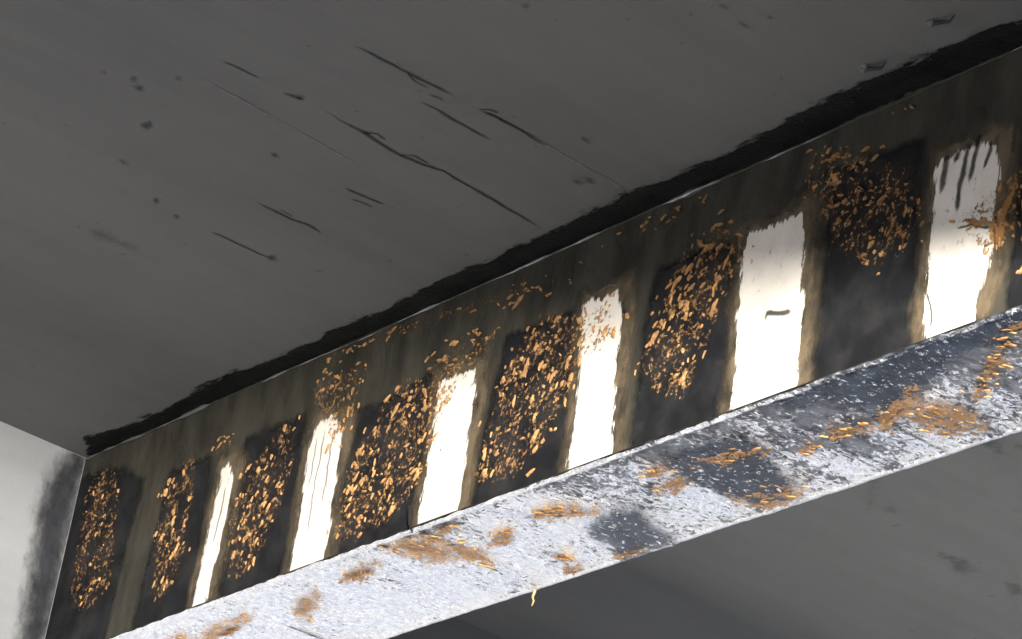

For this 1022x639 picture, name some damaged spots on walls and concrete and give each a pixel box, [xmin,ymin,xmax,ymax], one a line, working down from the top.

crack [214,233,264,256]
corrosion [224,415,300,579]
crack [262,205,319,232]
corrosion [314,275,554,545]
crack [345,123,530,222]
water stain [412,354,490,527]
crack [364,50,543,144]
corrosion [473,293,616,483]
water stain [560,272,637,472]
corrosion [634,209,754,399]
water stain [721,193,823,413]
water stain [912,123,1017,342]